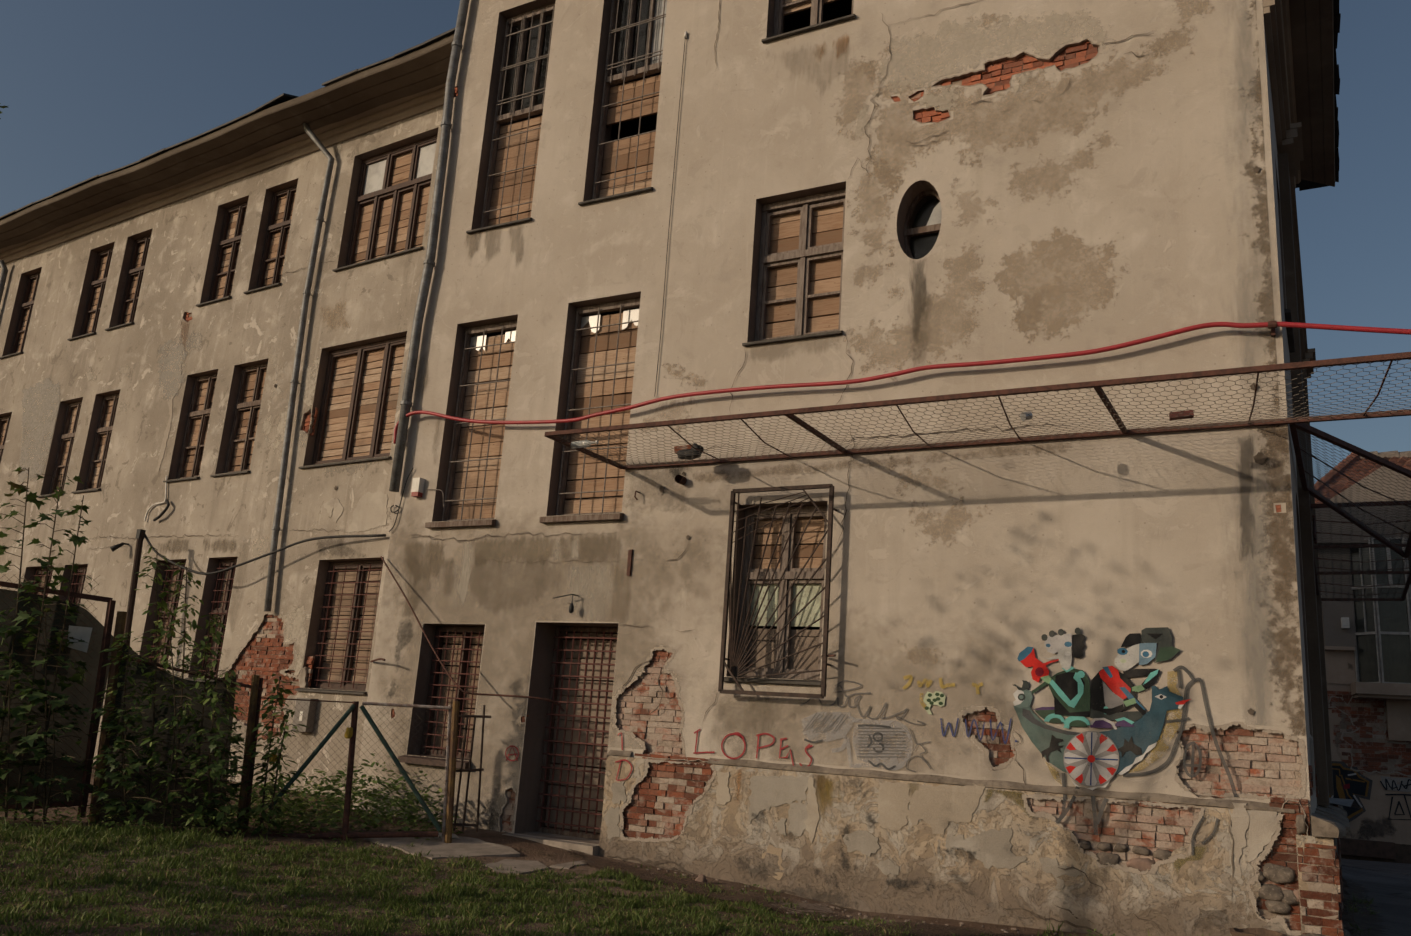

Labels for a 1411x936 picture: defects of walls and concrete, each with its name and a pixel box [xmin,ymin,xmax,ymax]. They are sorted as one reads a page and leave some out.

crack [848,0,1071,179]
spalling [867,31,1193,192]
crack [1100,32,1154,57]
water stain [1241,42,1277,365]
water stain [912,266,926,338]
water stain [1240,383,1306,736]
peeling [170,638,190,678]
spalling [222,605,315,742]
spalling [604,646,731,842]
peeling [748,774,820,880]
peeling [843,705,1027,876]
spalling [1021,708,1344,936]